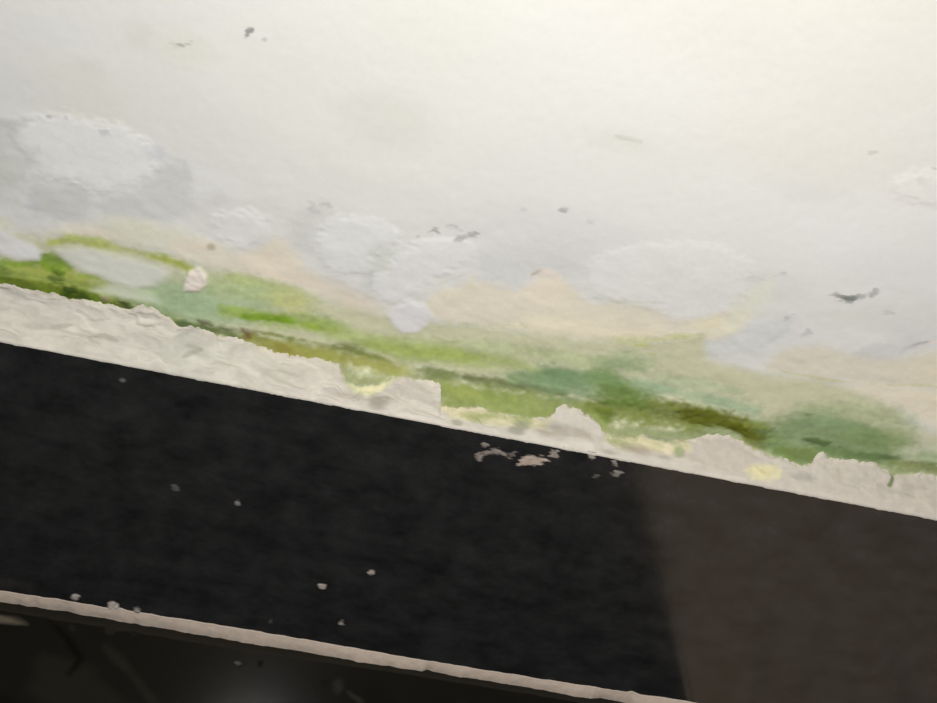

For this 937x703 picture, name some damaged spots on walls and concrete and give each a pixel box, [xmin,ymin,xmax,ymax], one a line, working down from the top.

water stain [0,111,239,225]
water stain [43,231,197,272]
water stain [0,257,58,294]
water stain [221,269,303,292]
peeling [387,299,437,336]
water stain [193,301,589,390]
spalling [320,384,400,412]
water stain [628,369,768,414]
spalling [504,417,673,462]
water stain [607,421,745,441]
water stain [764,440,937,478]